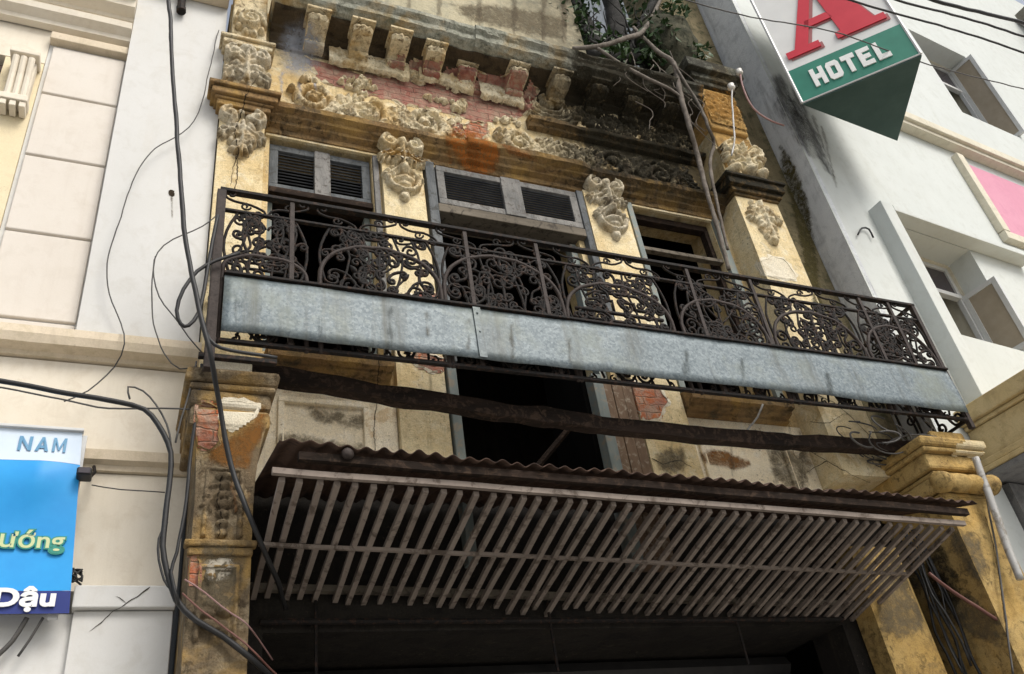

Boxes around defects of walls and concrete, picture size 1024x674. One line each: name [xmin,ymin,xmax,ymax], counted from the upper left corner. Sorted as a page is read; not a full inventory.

crack [231,82,254,189]
flaking render [304,54,540,139]
rust [448,129,532,183]
water stain [775,76,828,170]
flaking render [191,397,261,454]
flaking render [617,377,671,422]
water stain [658,449,684,473]
flaking render [187,555,206,588]
water stain [878,543,1004,644]
water stain [950,532,987,581]